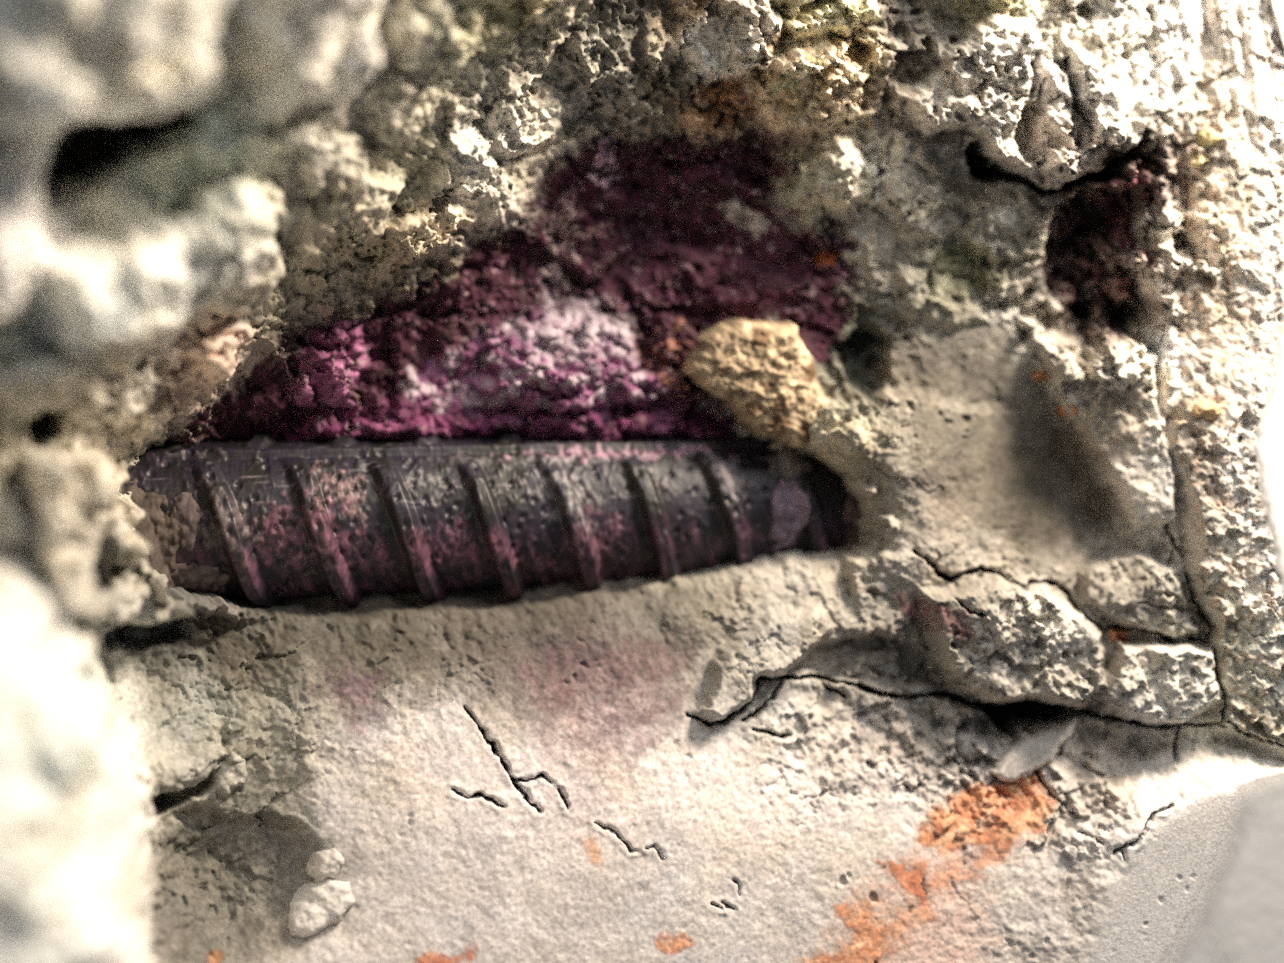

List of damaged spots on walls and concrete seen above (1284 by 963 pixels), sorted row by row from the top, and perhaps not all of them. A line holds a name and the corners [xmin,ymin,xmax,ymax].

spalling [323,335,375,439]
crack [926,560,1076,609]
crack [703,674,1183,737]
crack [459,730,542,805]